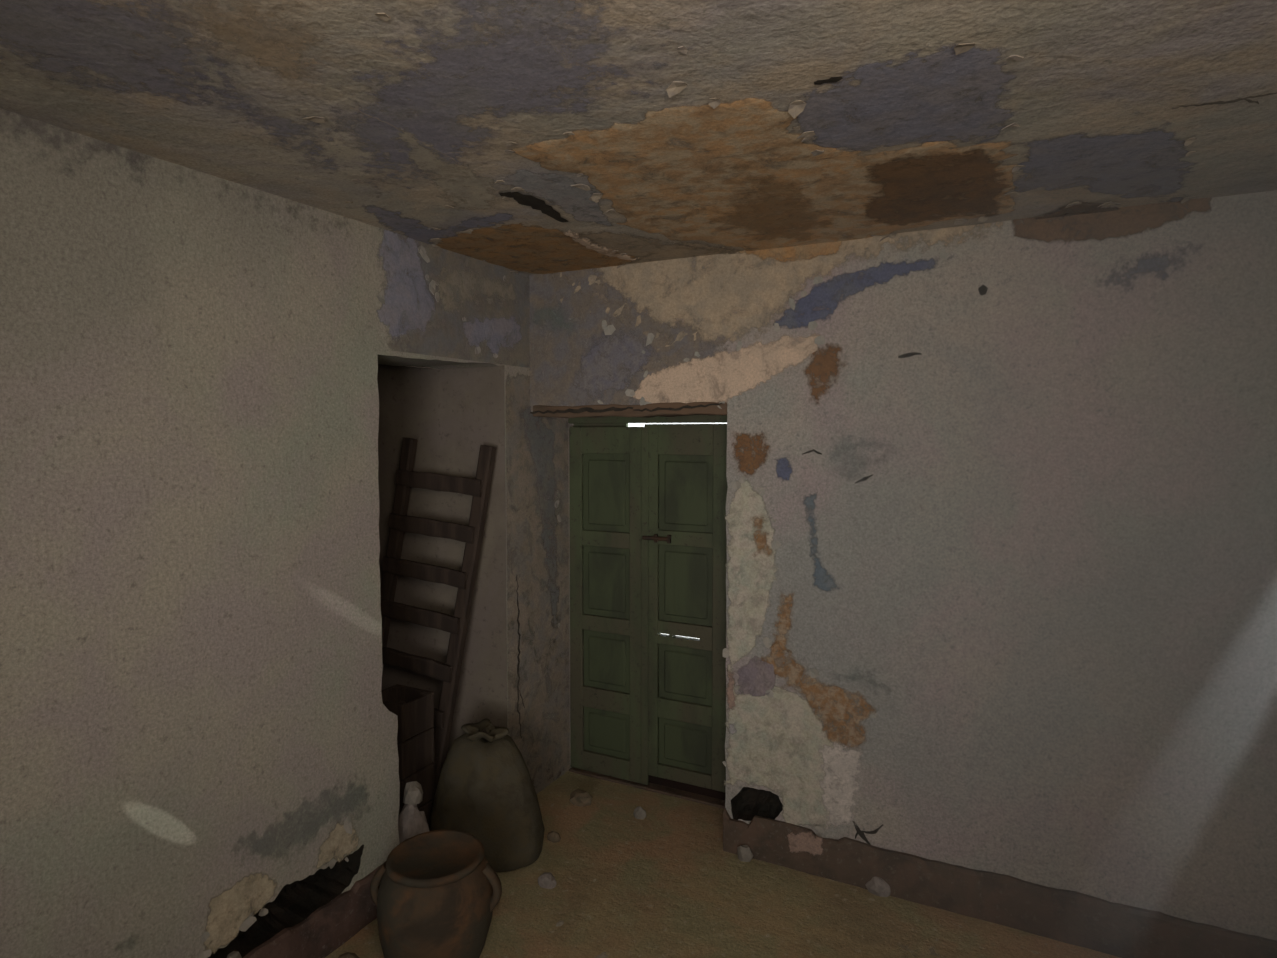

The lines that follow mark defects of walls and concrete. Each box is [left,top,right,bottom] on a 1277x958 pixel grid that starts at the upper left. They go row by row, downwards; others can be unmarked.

flaking render [344,98,1025,409]
peeling [776,458,793,480]
flaking render [722,476,841,856]
spalling [198,816,364,958]